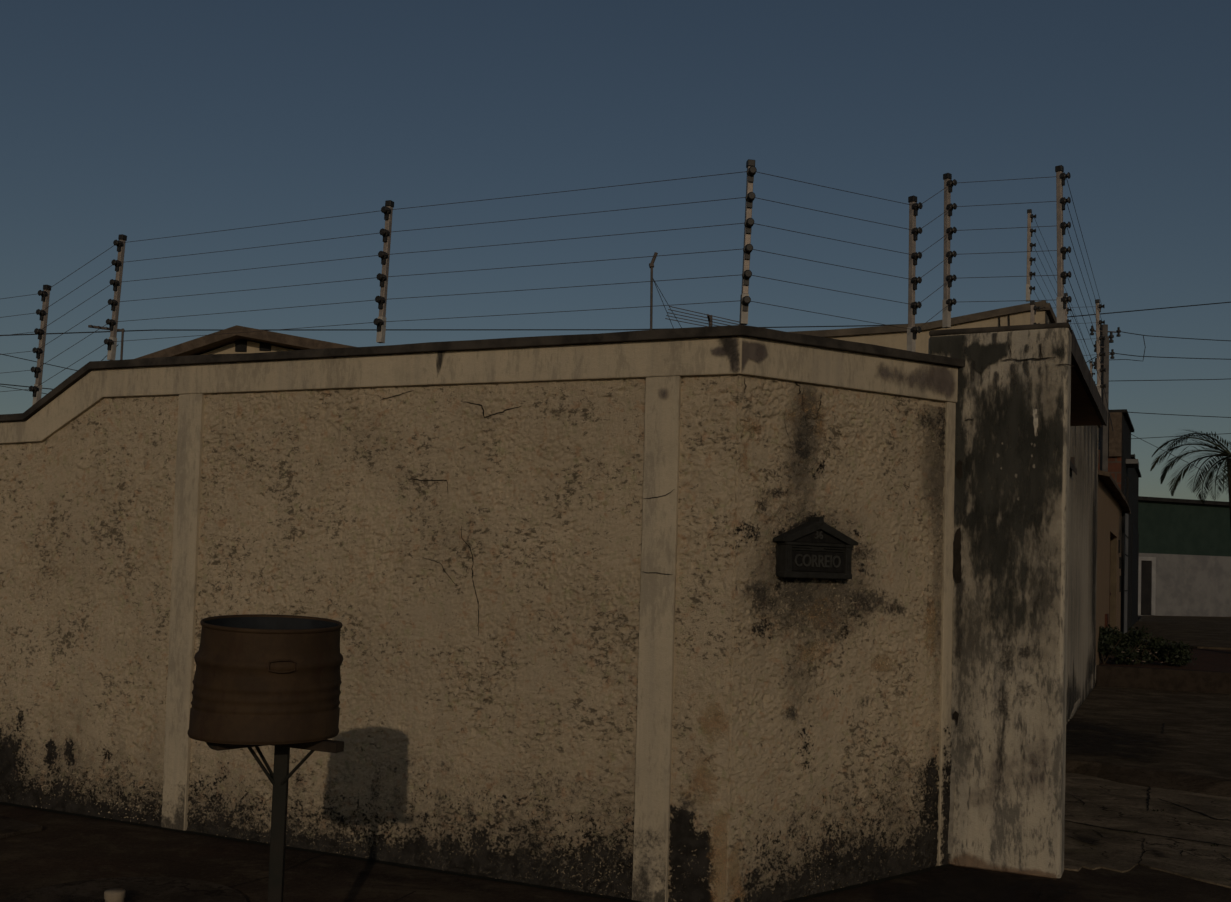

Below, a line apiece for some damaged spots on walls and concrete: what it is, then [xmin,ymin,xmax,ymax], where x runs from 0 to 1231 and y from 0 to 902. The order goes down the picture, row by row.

leakage [711,336,767,371]
crack [423,526,479,637]
leakage [736,583,780,638]
leakage [735,489,788,548]
leakage [955,502,1043,657]
leakage [1066,425,1098,723]
leakage [0,708,272,843]
leakage [286,749,939,902]
crack [1065,786,1231,866]